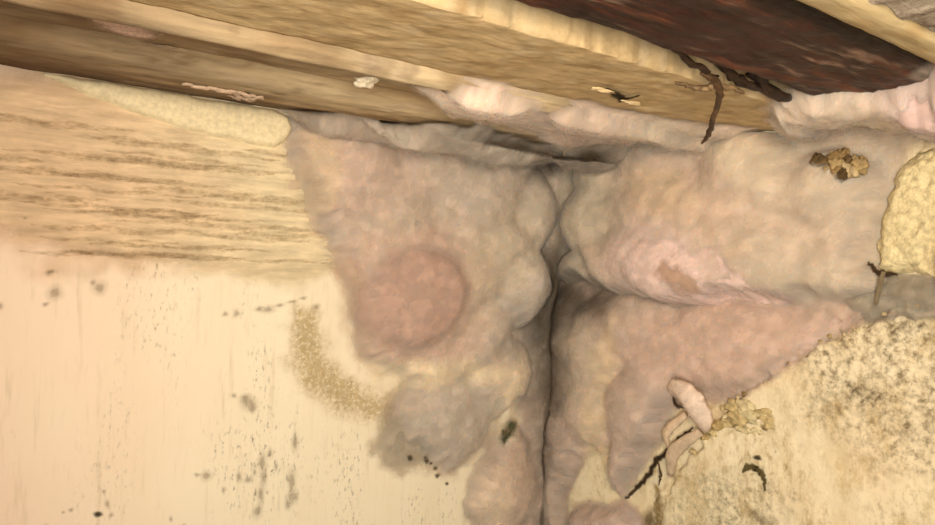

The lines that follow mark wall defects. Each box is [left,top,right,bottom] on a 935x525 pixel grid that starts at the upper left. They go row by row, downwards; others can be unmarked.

crack [625,396,693,499]